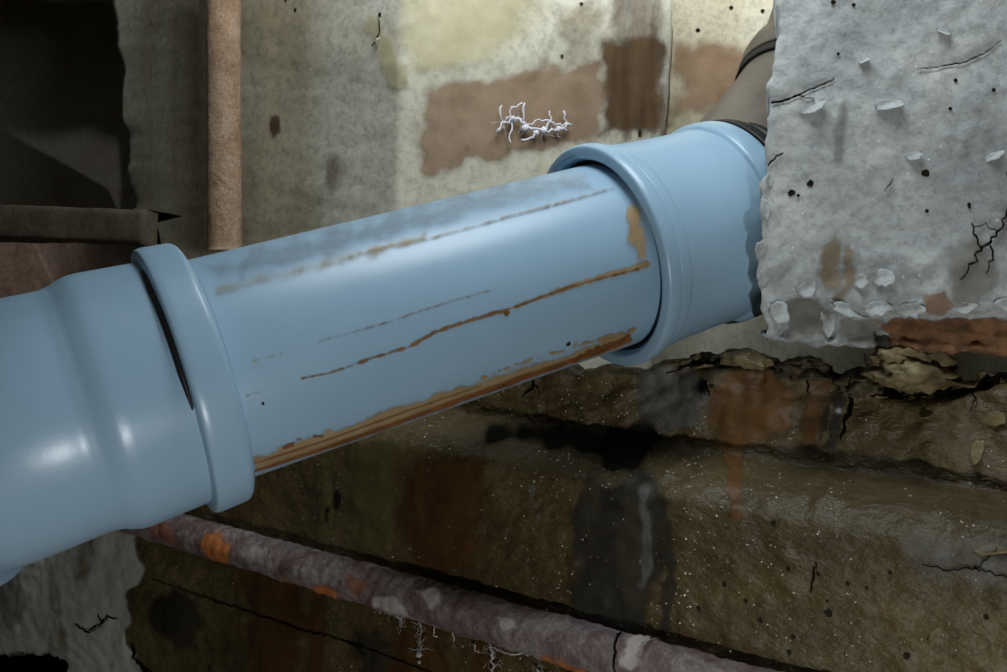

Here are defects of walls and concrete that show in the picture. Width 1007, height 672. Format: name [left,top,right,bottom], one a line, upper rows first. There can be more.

crack [918,41,1001,70]
crack [771,79,834,104]
crack [960,210,1007,280]
corrosion [877,293,1007,357]
crack [522,379,540,399]
leakage [485,421,677,639]
crack [923,549,1007,578]
crack [74,614,118,633]
crack [152,579,430,672]